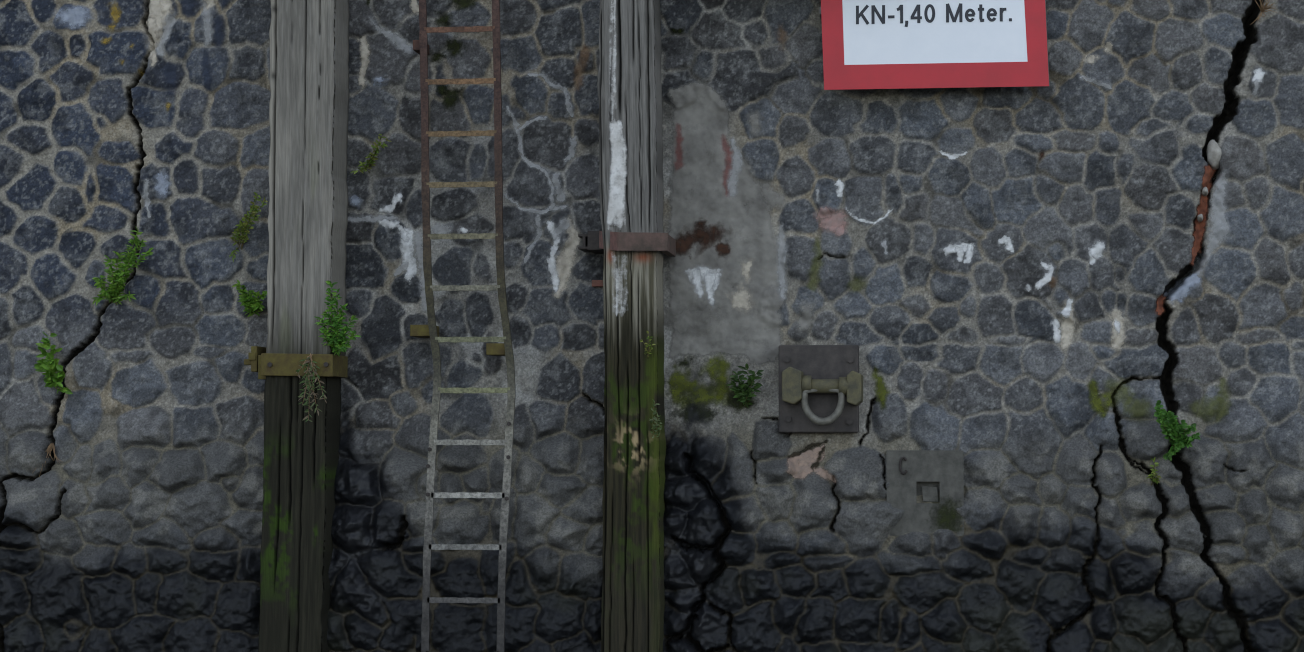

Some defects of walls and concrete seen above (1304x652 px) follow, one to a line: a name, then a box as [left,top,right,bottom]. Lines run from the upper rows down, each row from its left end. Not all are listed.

crack [0,0,155,547]
rust [676,221,730,256]
crack [1047,0,1264,652]
spalling [787,440,836,483]
crack [830,482,841,531]
crack [859,398,887,489]